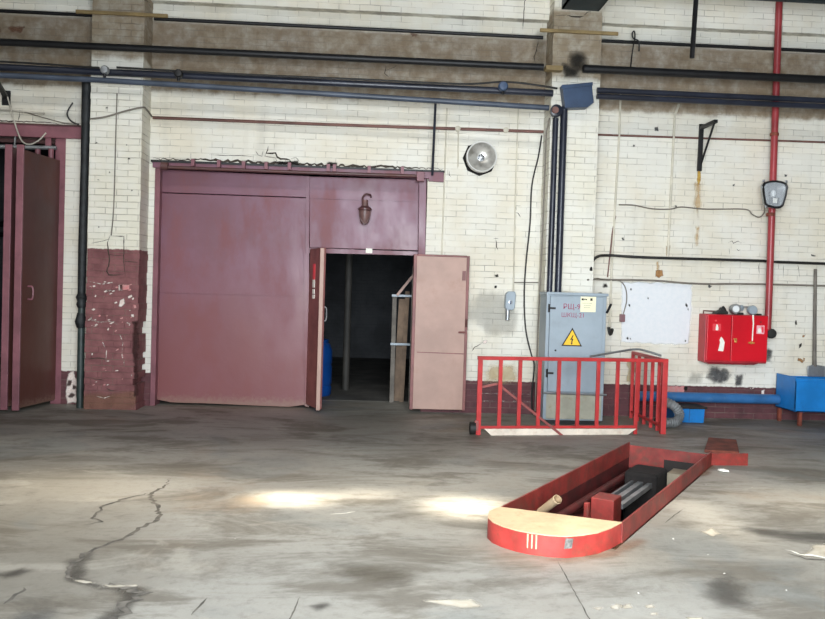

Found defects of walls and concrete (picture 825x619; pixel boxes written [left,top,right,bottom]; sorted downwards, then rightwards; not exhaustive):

spalling [89,281,139,398]
crack [4,588,26,604]
crack [65,479,169,619]
spalling [788,537,825,560]